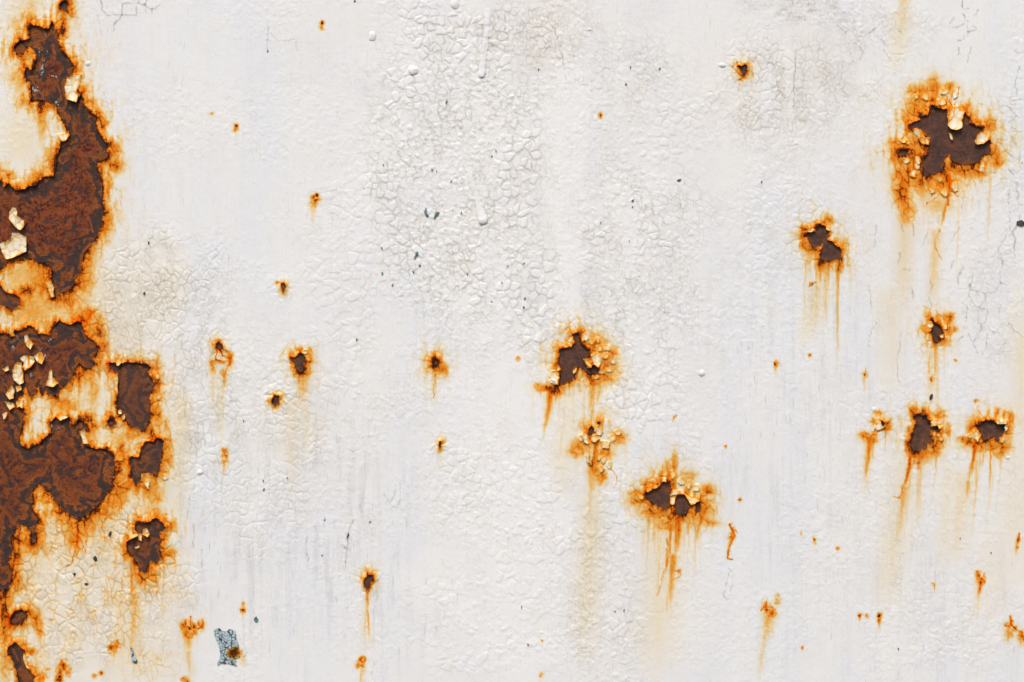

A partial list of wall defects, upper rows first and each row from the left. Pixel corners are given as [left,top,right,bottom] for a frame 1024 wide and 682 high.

rust [891,85,999,215]
rust [801,218,843,271]
rust [0,0,172,682]
rust [289,350,309,376]
rust [430,354,443,371]
rust [538,329,615,410]
rust [927,315,952,344]
rust [905,408,949,476]
rust [962,411,1011,461]
rust [634,465,712,531]
rust [363,572,374,591]
peeling [214,628,247,666]